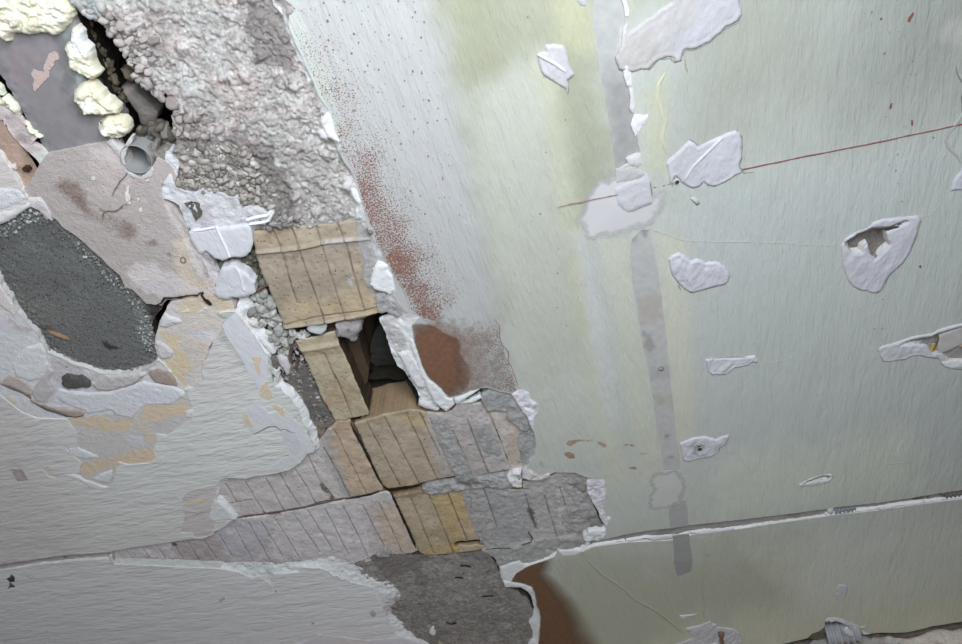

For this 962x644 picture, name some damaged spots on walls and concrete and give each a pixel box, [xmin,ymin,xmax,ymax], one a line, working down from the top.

spalling [70,0,482,412]
corrosion [296,1,516,397]
hole [846,223,901,258]
peeling [0,285,320,490]
spalling [909,327,962,368]
peeling [181,478,238,538]
spalling [817,495,962,516]
spalling [115,522,774,644]
corrosion [512,561,590,644]